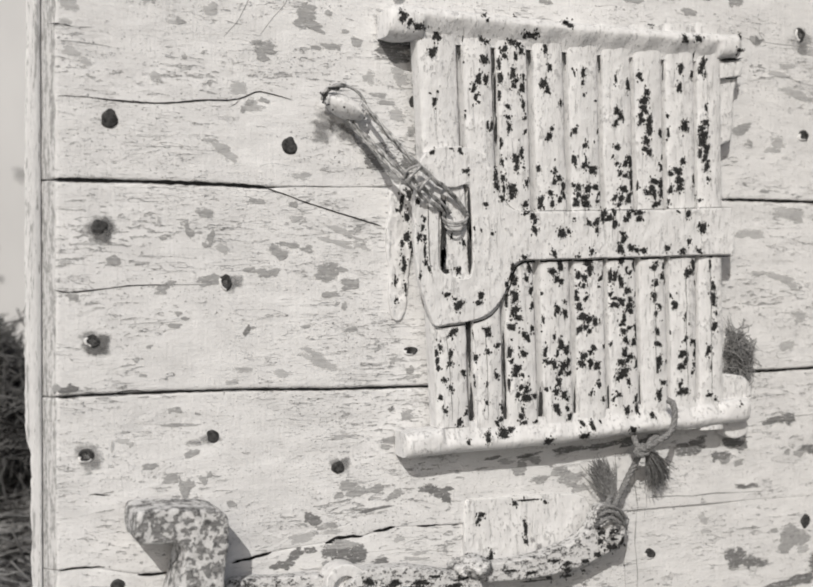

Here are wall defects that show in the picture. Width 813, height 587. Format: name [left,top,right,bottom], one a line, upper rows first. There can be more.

peeling [292,2,341,51]
peeling [374,39,413,86]
crack [61,91,292,107]
crack [54,177,382,226]
peeling [243,241,313,278]
peeling [314,262,359,310]
peeling [418,483,454,505]
crack [325,526,395,544]
crack [59,564,103,572]
crack [139,570,167,578]
crack [233,552,271,563]
peeling [723,546,768,571]